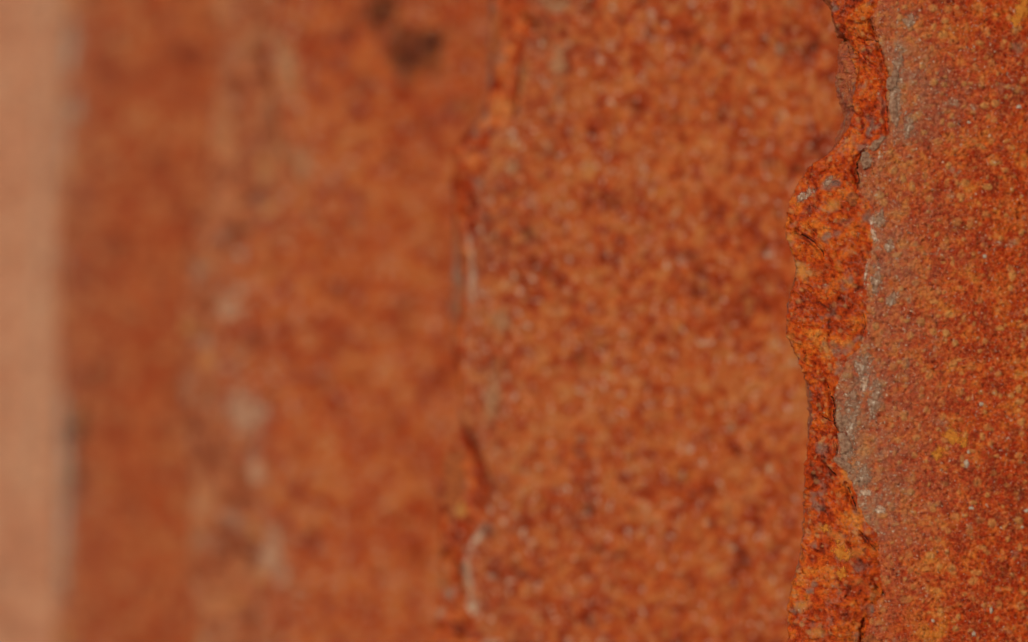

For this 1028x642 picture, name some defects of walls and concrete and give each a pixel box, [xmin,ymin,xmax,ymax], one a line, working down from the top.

spalling [784,0,914,642]
rust [931,426,967,461]